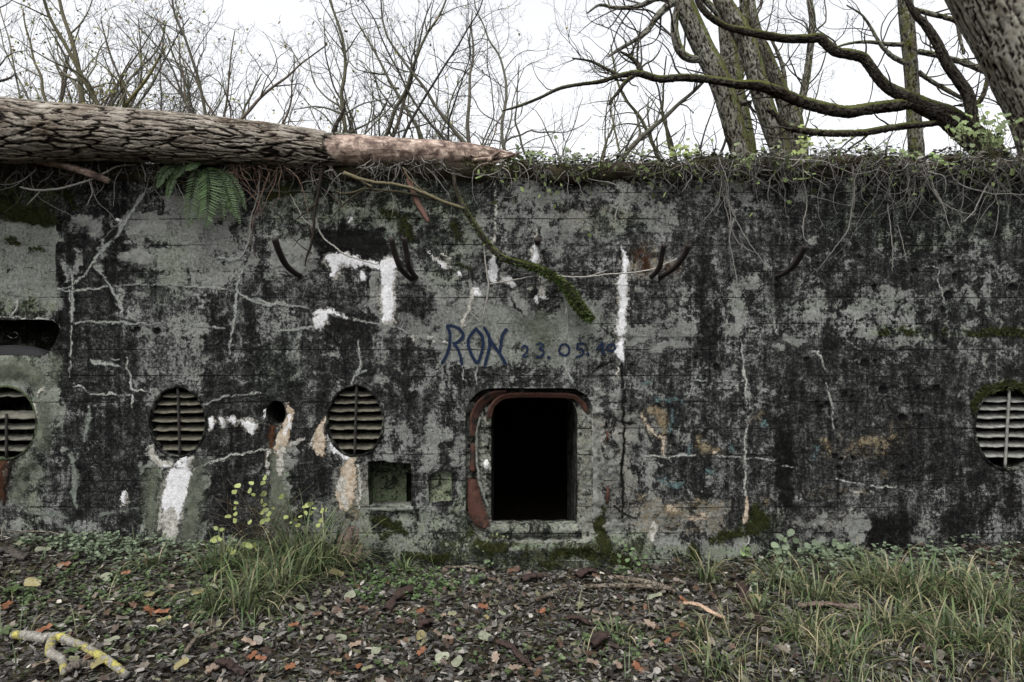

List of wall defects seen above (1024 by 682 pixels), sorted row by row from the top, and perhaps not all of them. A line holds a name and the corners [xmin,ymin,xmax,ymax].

crack [0,184,506,408]
water stain [309,211,448,348]
water stain [427,251,482,329]
water stain [488,180,546,303]
water stain [613,246,631,379]
water stain [8,408,93,535]
water stain [99,489,139,518]
water stain [148,444,196,542]
crack [193,448,271,471]
water stain [265,402,364,521]
crack [563,298,788,546]
crack [812,350,835,429]